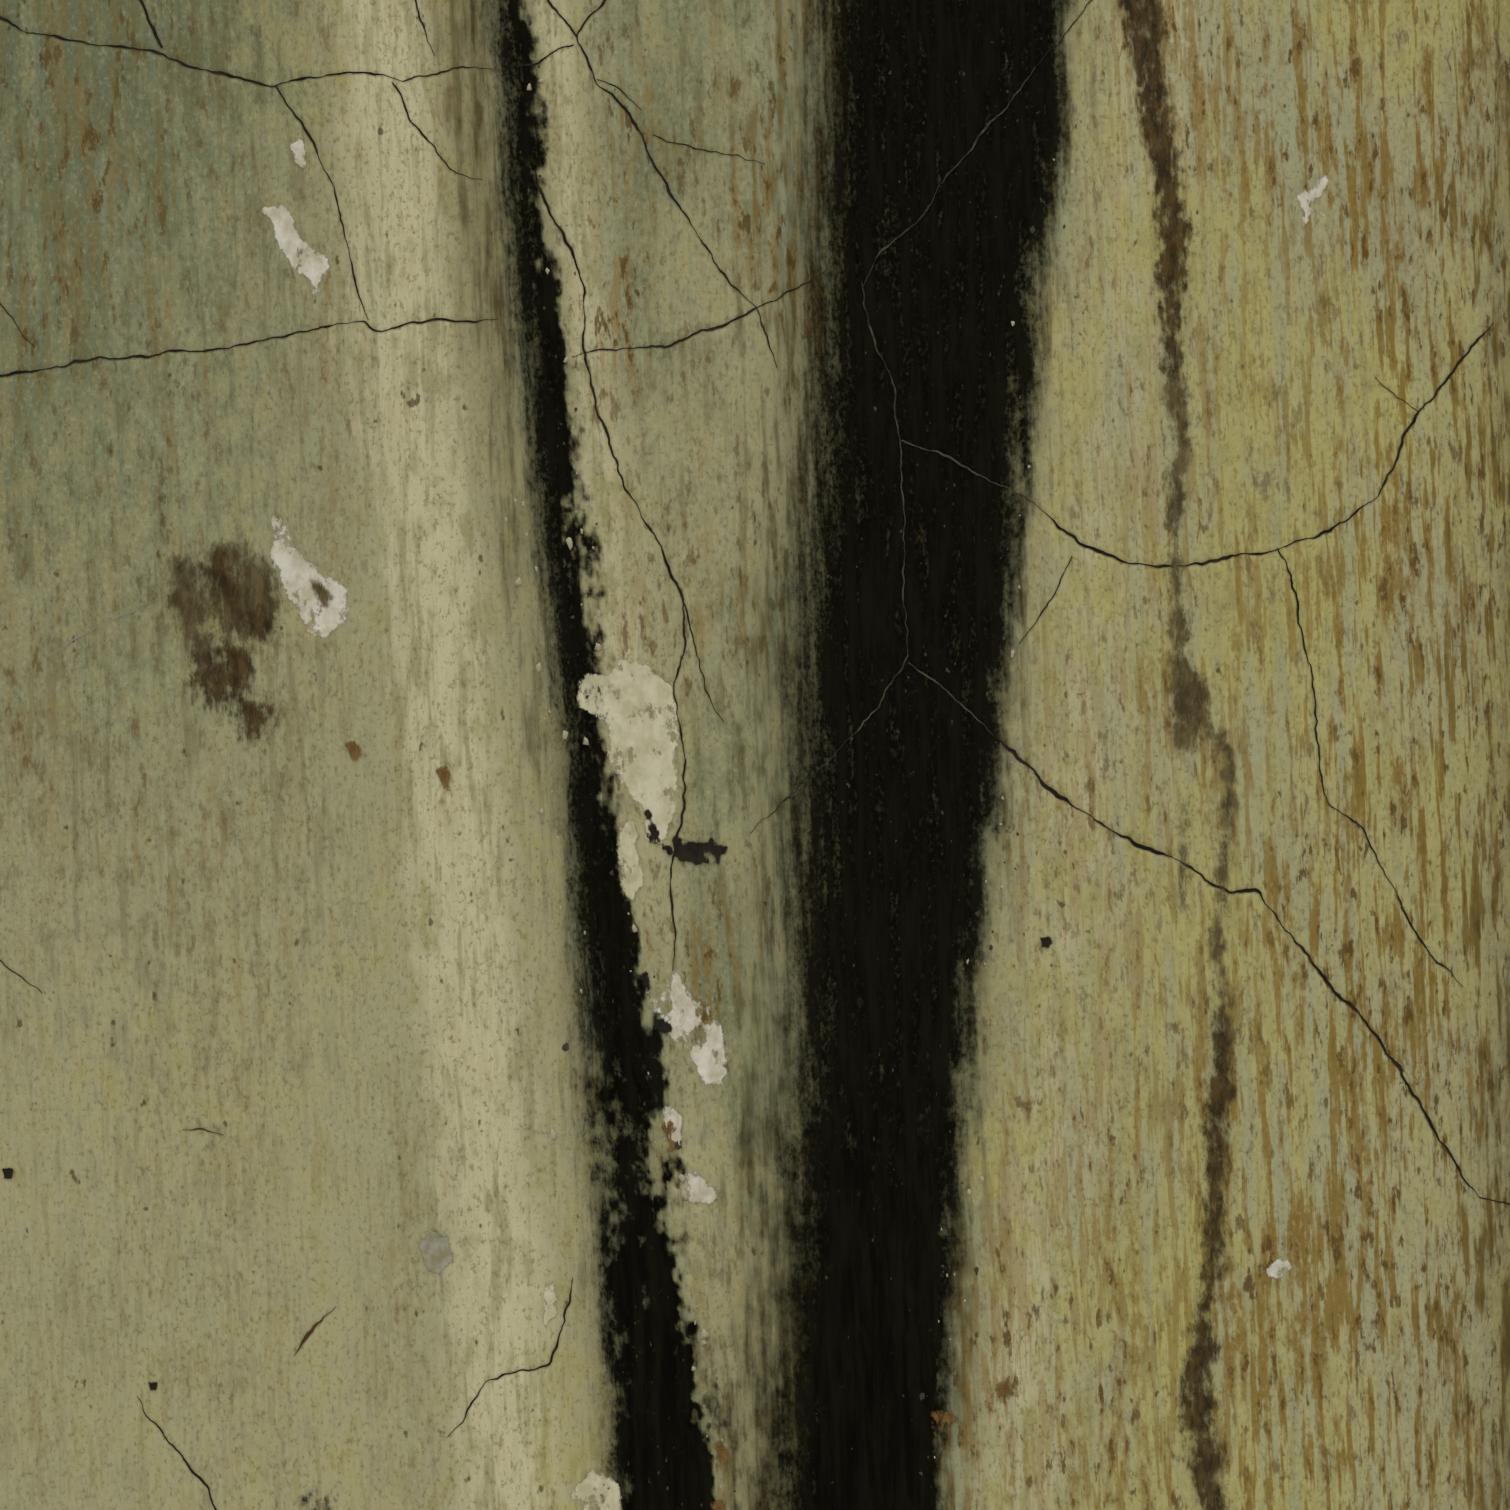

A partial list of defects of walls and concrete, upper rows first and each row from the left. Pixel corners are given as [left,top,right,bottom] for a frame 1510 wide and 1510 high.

spalling [290,139,306,168]
spalling [262,205,330,294]
crack [0,0,826,971]
water stain [167,543,280,740]
spalling [270,516,349,638]
crack [750,0,1510,1205]
peeling [577,659,728,932]
peeling [630,970,727,1085]
peeling [654,1106,682,1150]
crack [447,1278,573,1438]
crack [137,1396,217,1510]
peeling [571,1469,622,1510]